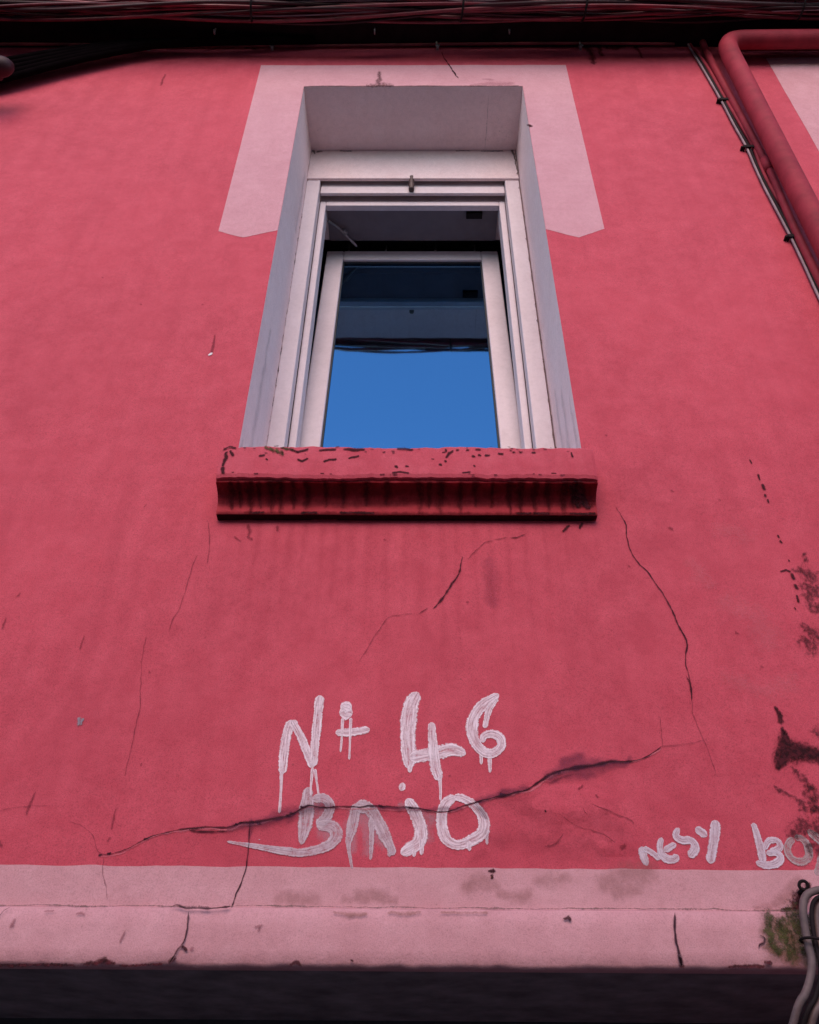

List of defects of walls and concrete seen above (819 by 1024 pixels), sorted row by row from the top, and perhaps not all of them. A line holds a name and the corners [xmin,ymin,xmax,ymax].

peeling [221,434,367,474]
peeling [431,415,557,475]
crack [422,557,463,612]
crack [616,508,692,700]
water stain [792,553,819,612]
water stain [774,706,819,852]
crack [0,721,680,964]
water stain [782,882,811,912]
crack [548,908,798,968]